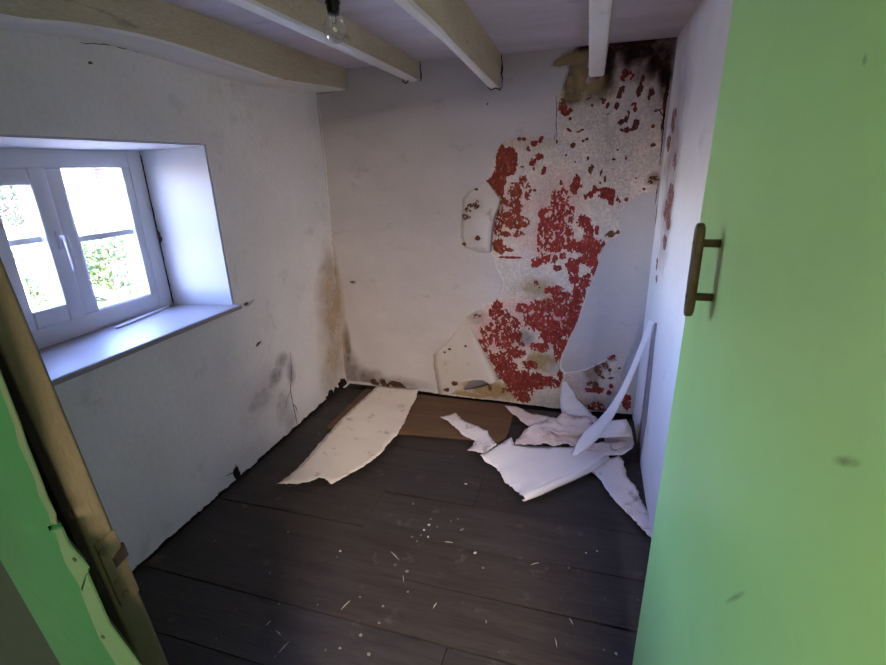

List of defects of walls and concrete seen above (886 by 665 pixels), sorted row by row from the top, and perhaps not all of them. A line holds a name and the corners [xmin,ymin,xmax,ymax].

peeling [452,47,671,460]
leakage [553,37,677,103]